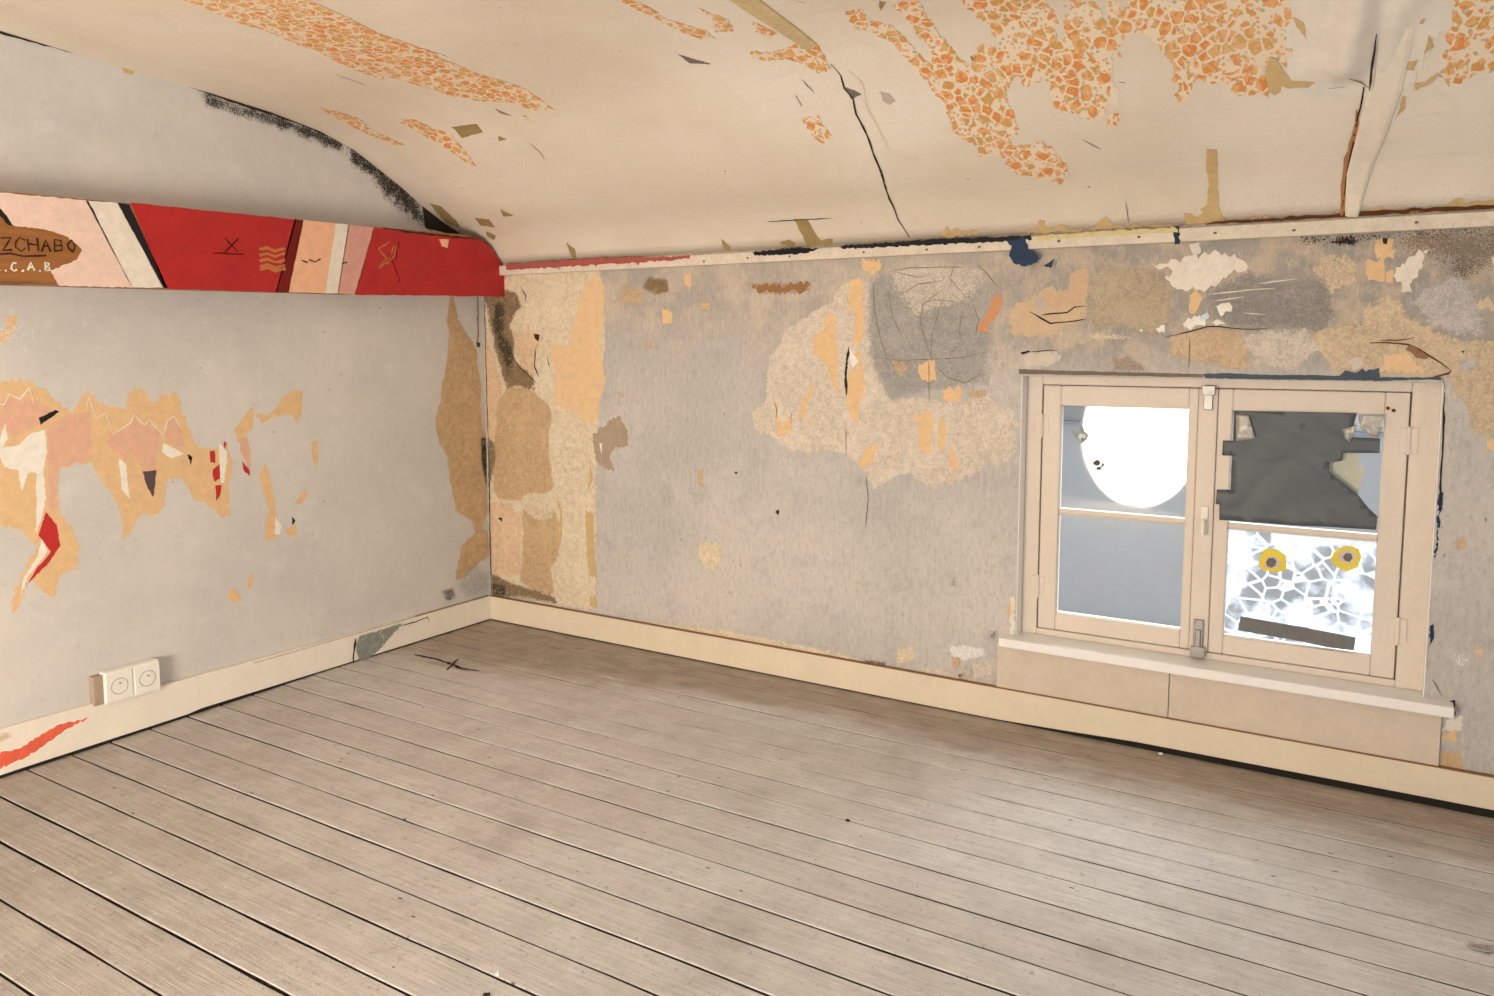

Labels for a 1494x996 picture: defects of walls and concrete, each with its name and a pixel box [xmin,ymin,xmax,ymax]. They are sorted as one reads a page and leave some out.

peeling [1265,57,1314,96]
peeling [1293,17,1306,39]
peeling [1396,18,1437,117]
peeling [0,378,308,614]
peeling [435,243,628,612]
crack [836,69,998,401]
peeling [751,149,1225,490]
spalling [1019,238,1494,558]
peeling [1368,198,1494,213]
peeling [1432,680,1463,769]